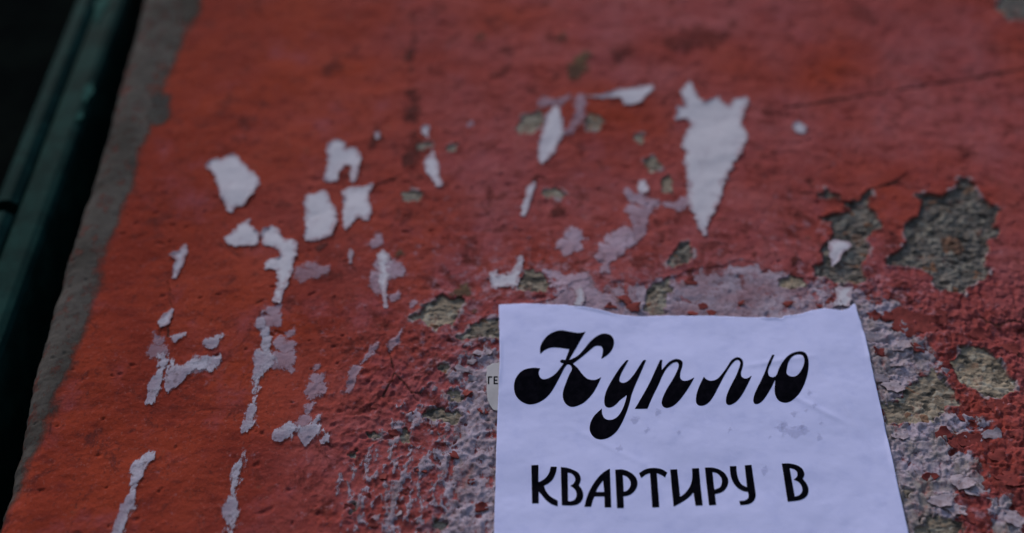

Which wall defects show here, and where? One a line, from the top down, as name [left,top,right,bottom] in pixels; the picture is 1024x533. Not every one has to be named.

flaking render [0,0,201,533]
peeling [336,314,500,533]
spalling [409,295,465,331]
spalling [515,110,544,135]
spalling [644,157,674,195]
peeling [584,180,1024,533]